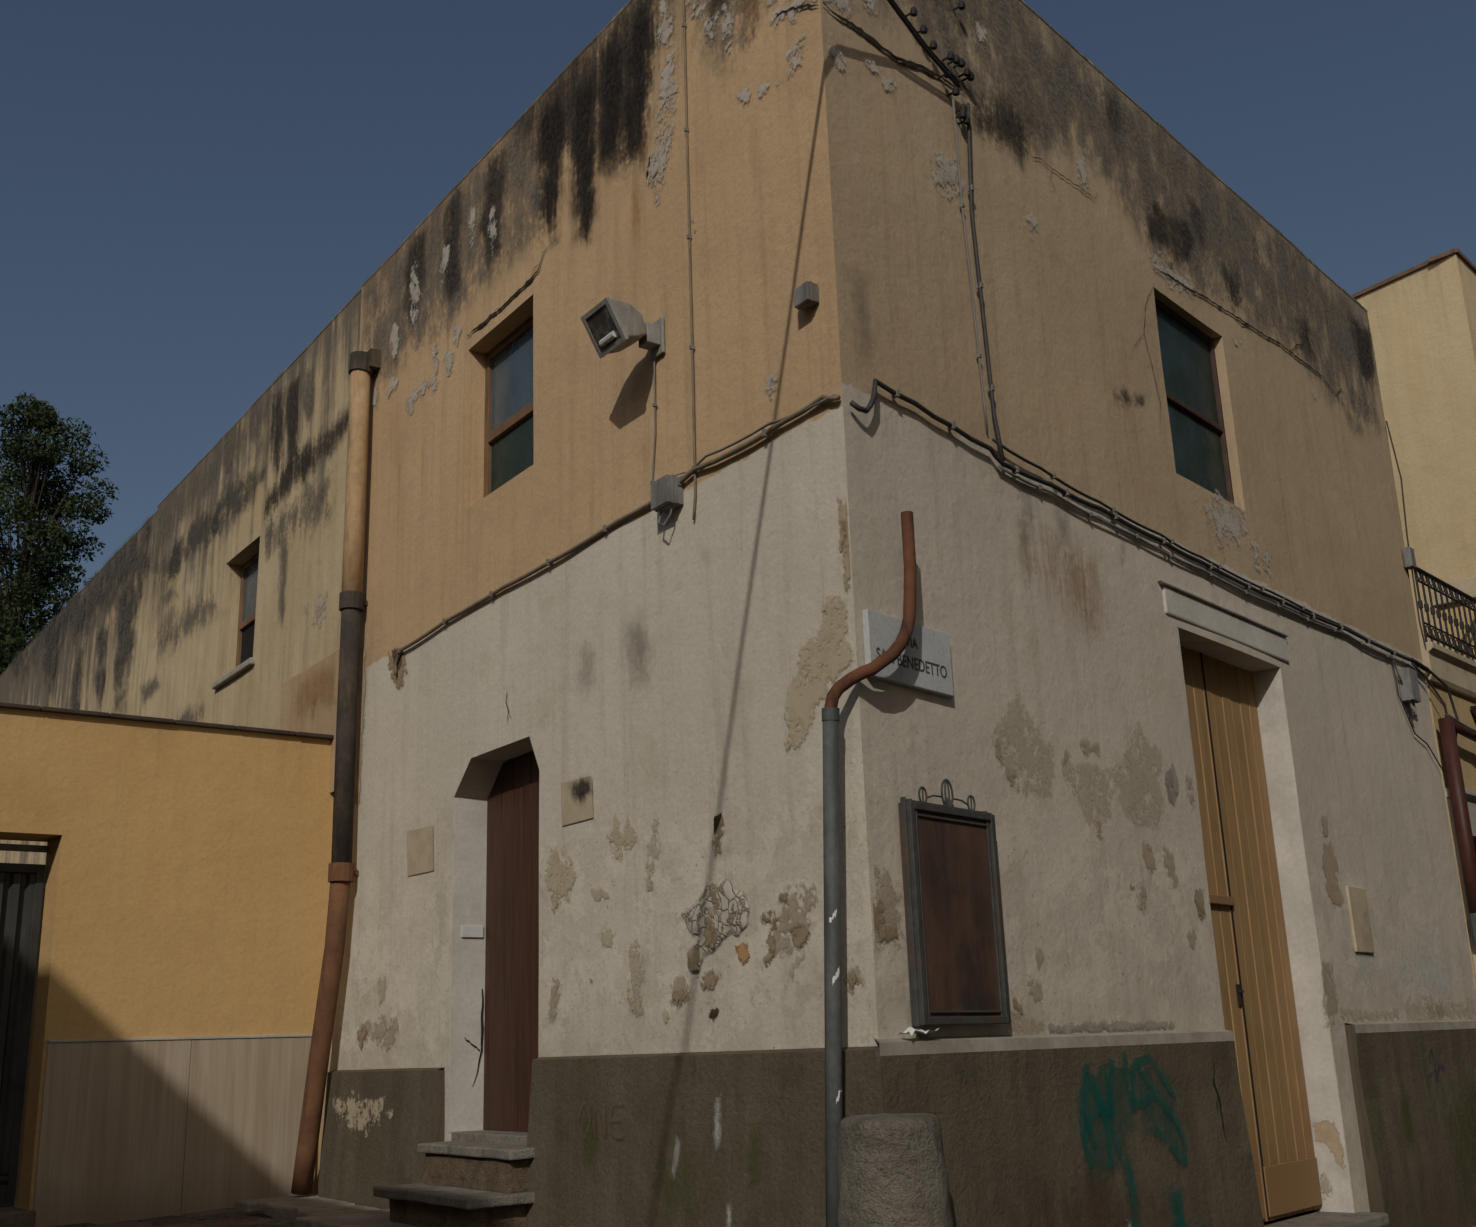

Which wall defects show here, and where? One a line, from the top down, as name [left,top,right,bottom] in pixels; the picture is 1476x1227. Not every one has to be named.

peeling [646,0,734,204]
leakage [365,0,657,375]
leakage [911,0,1376,427]
leakage [12,370,349,712]
peeling [784,497,853,750]
peeling [1165,764,1195,807]
peeling [601,928,644,1016]
peeling [662,879,818,1023]
peeling [1130,842,1179,914]
peeling [1187,888,1206,948]
peeling [332,1090,394,1138]